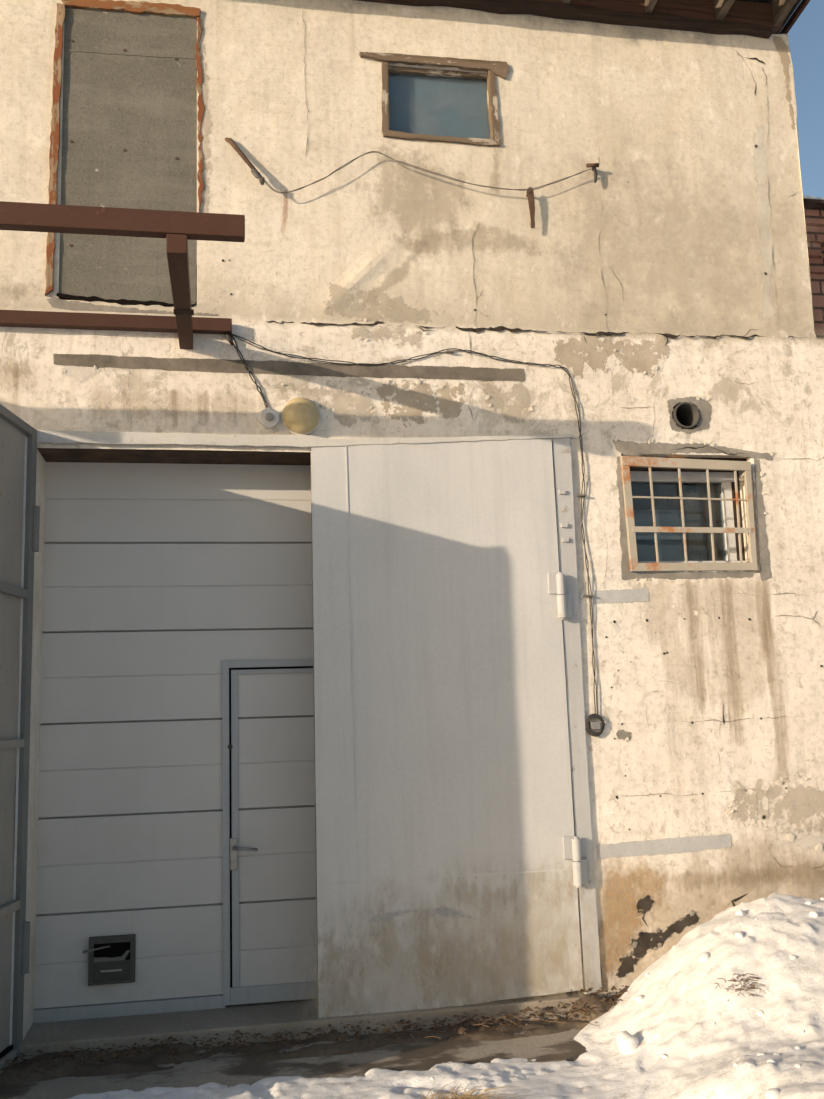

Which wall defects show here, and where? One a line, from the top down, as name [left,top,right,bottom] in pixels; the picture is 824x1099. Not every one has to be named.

crack [249,51,810,421]
peeling [553,334,670,378]
peeling [371,378,465,427]
damp [599,869,661,982]
spalling [616,895,699,978]